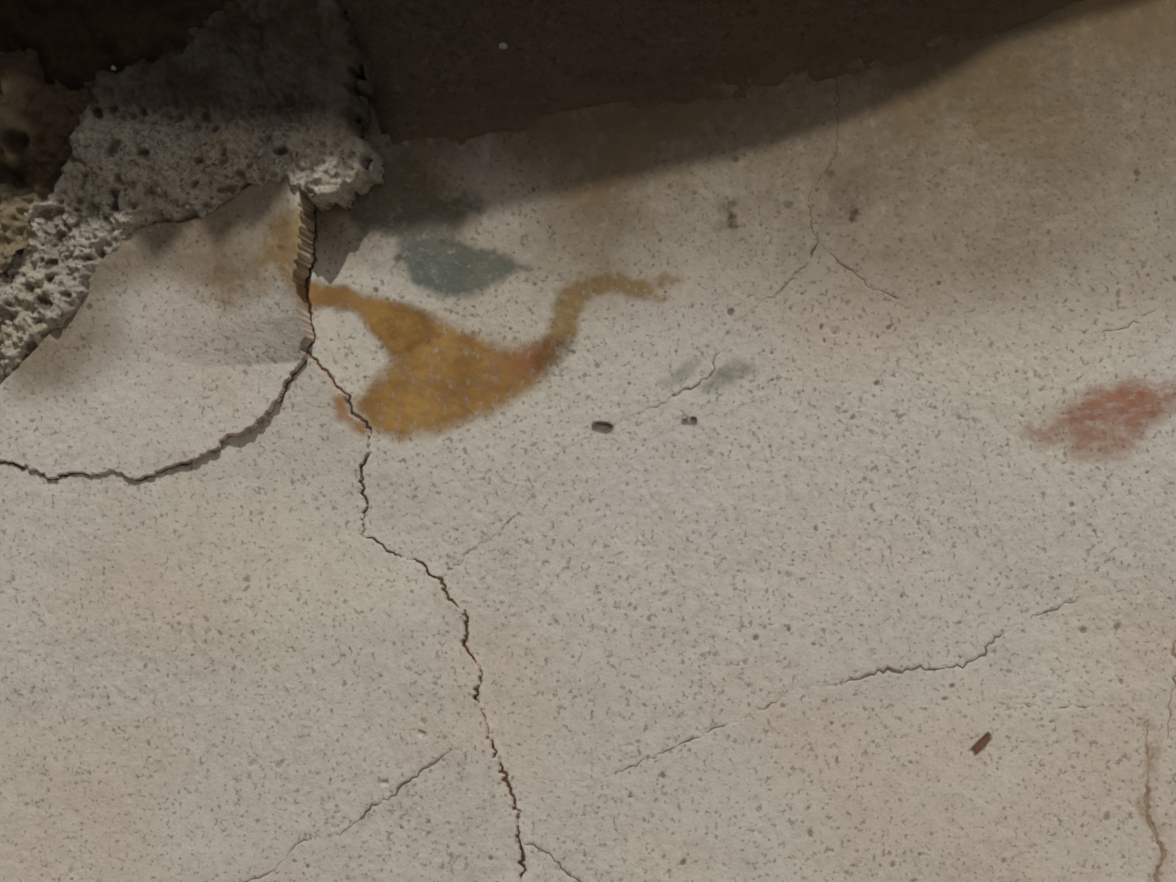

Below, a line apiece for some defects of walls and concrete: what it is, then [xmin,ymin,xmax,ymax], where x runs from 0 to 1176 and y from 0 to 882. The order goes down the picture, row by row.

spalling [0,0,385,385]
crack [1074,301,1167,335]
crack [0,436,230,481]
crack [268,209,581,882]
crack [843,596,1081,683]
crack [614,685,811,774]
crack [1144,640,1176,882]
crack [245,839,308,882]